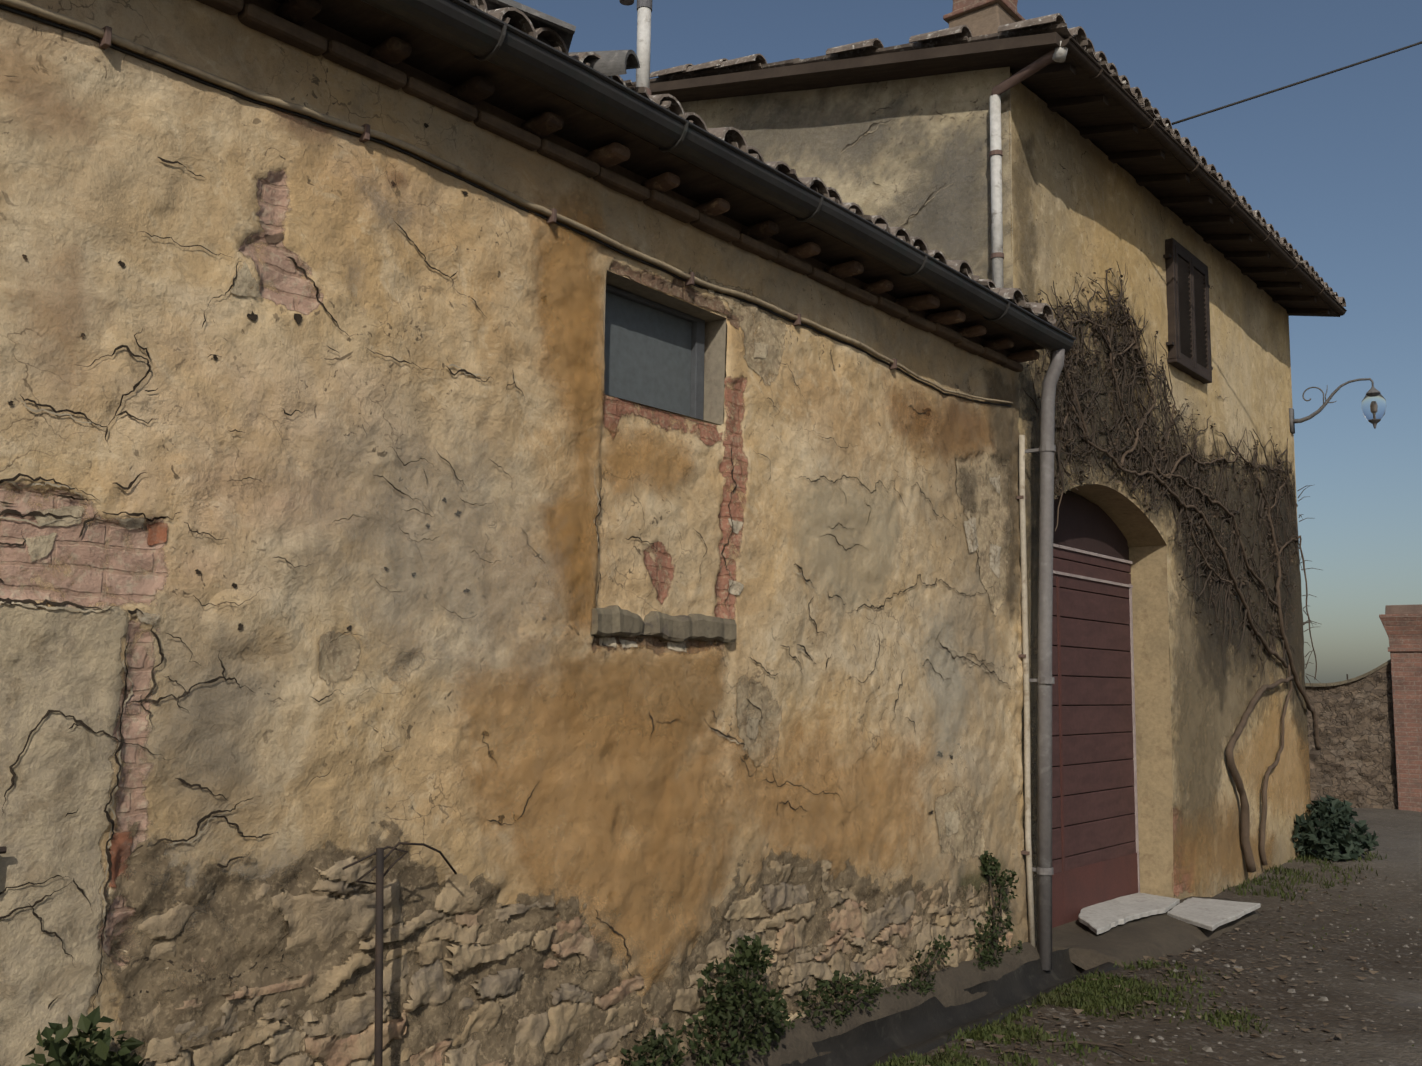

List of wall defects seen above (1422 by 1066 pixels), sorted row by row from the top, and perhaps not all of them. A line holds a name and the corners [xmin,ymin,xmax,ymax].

crack [20,328,158,441]
crack [140,231,242,358]
flaking render [230,170,323,324]
crack [285,255,525,398]
crack [394,221,487,318]
crack [374,447,513,542]
flaking render [602,261,787,619]
crack [649,436,1016,816]
flaking render [0,483,168,966]
crack [0,472,346,1010]
damp [471,652,721,989]